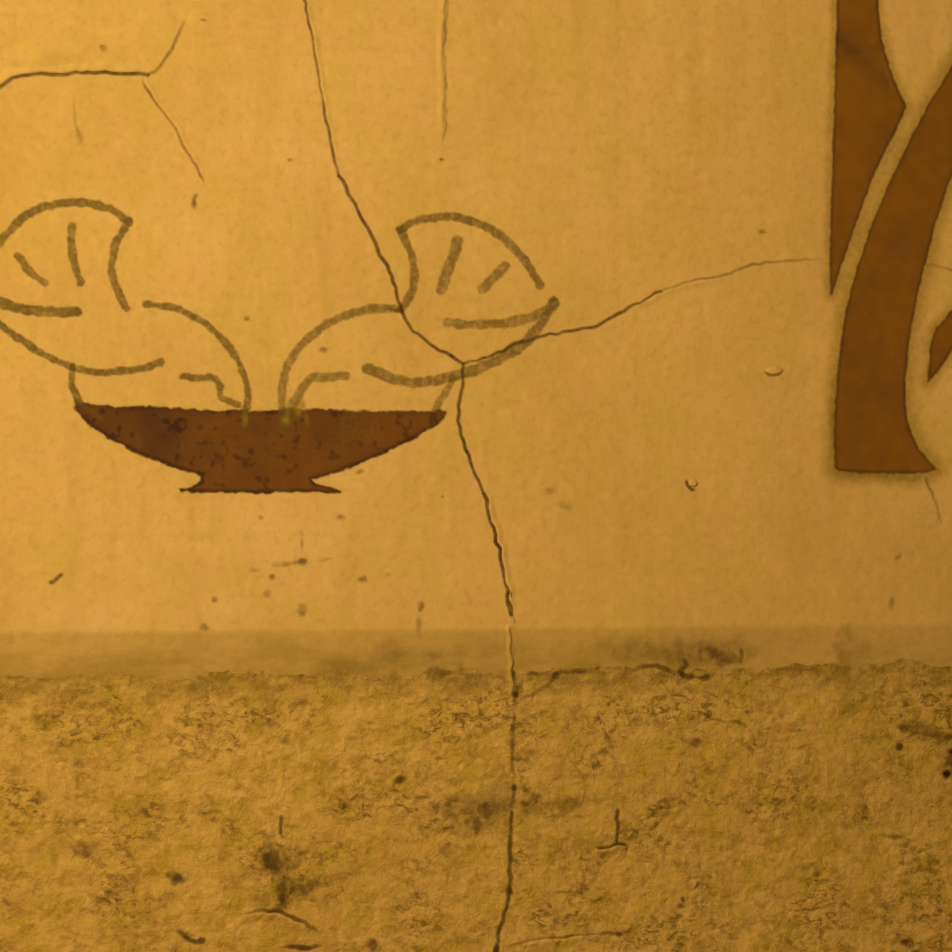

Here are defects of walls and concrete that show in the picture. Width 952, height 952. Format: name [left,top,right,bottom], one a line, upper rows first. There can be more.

crack [0,61,202,168]
crack [304,0,725,697]
crack [493,785,516,952]
crack [592,809,628,859]